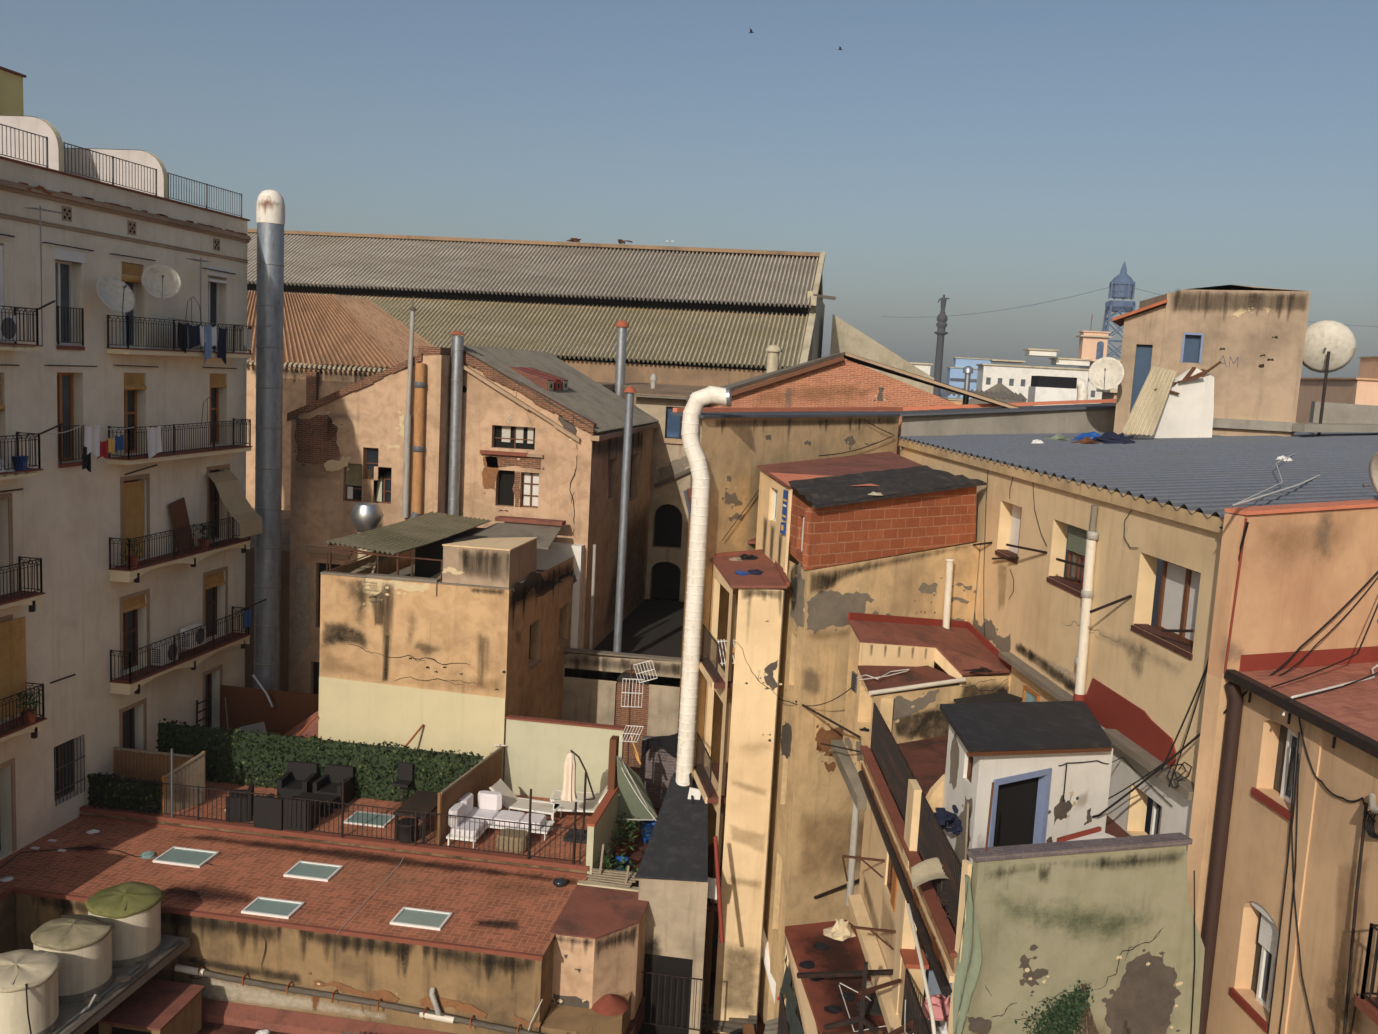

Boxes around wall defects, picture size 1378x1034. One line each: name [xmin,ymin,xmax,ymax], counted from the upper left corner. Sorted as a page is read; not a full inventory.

peeling [294,411,351,474]
peeling [790,562,890,634]
leakage [353,585,392,679]
crack [348,644,477,685]
peeling [949,733,973,865]
leakage [164,915,272,943]
leakage [301,931,528,977]
leakage [180,959,359,1014]
peeling [1101,949,1183,1034]